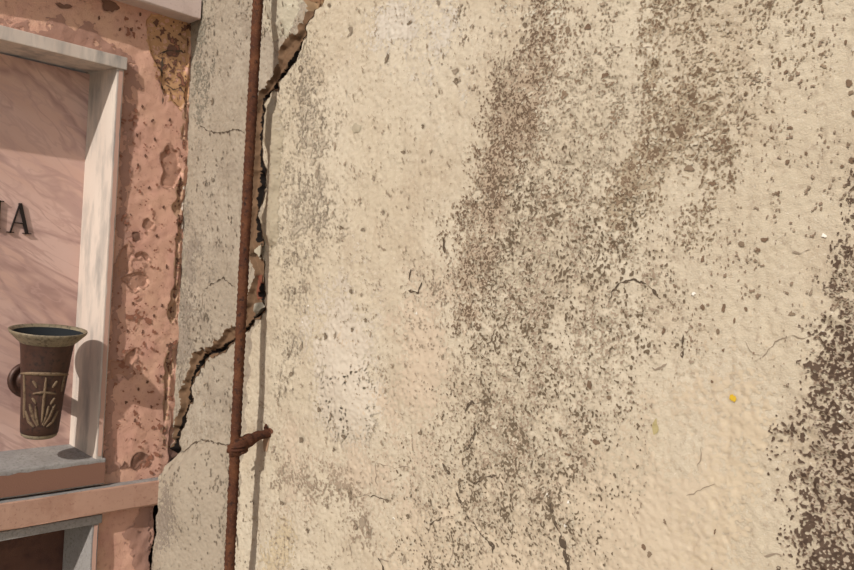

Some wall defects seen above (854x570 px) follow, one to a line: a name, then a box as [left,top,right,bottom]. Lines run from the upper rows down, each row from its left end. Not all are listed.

peeling [107,12,191,480]
crack [170,5,321,461]
spalling [304,0,330,11]
leakage [236,0,854,570]